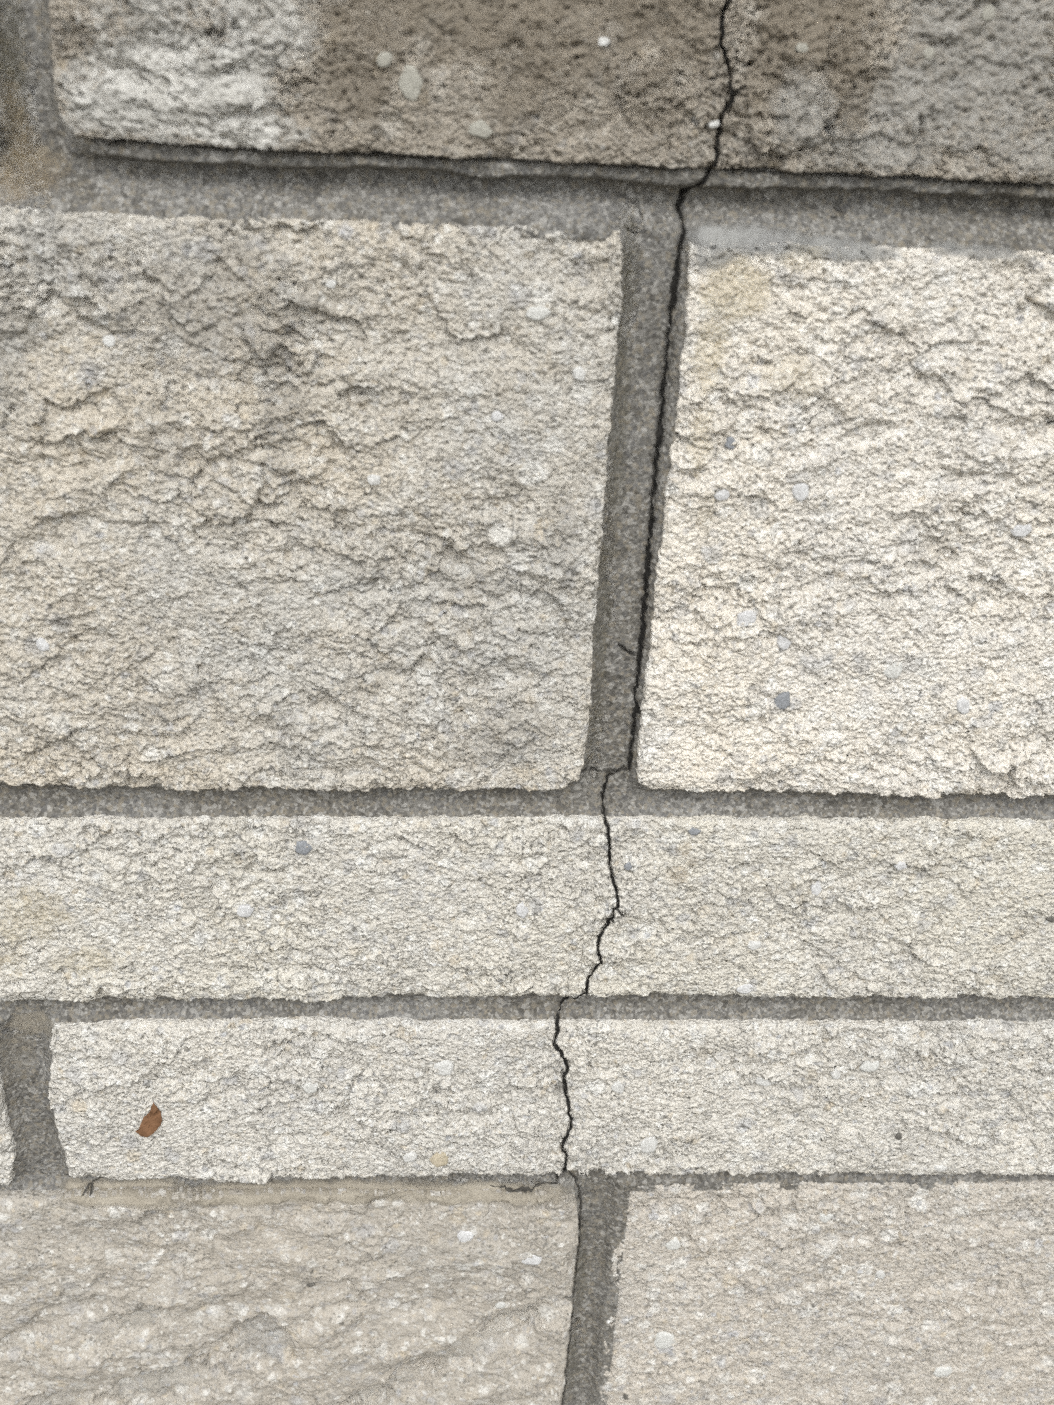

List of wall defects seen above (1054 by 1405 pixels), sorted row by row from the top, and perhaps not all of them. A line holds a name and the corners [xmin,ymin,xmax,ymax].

crack [490,0,1054,1404]